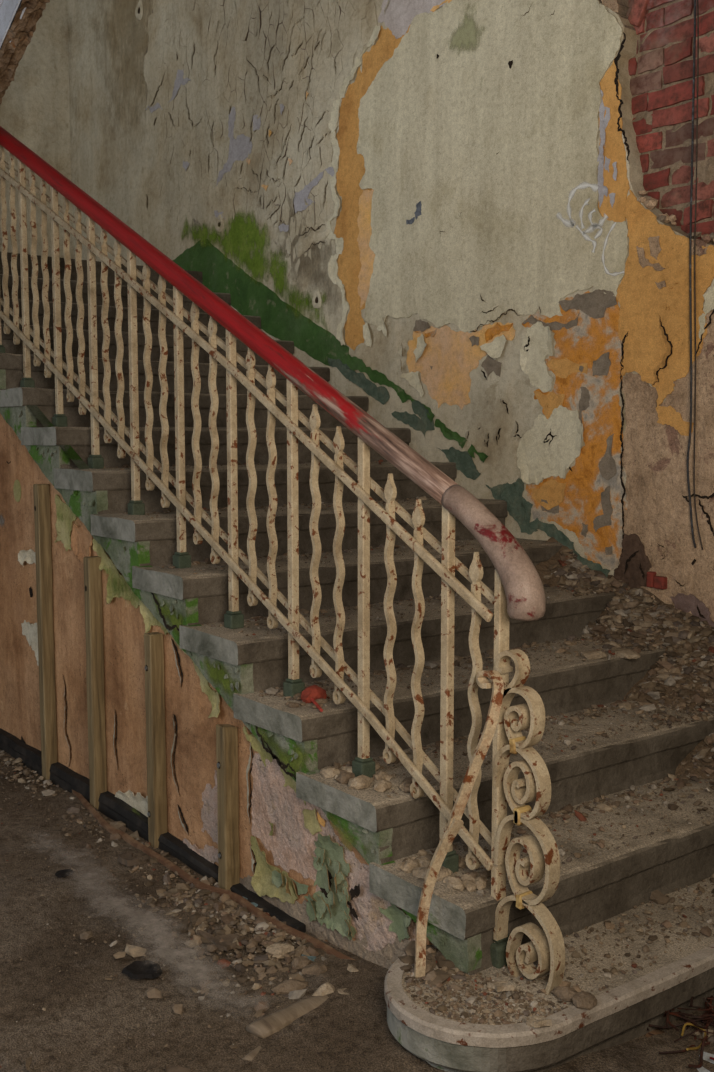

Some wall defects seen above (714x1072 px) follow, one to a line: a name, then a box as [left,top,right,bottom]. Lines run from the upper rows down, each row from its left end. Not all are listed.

spalling [0,0,50,105]
crack [144,0,340,236]
peeling [293,0,452,347]
spalling [599,0,714,244]
crack [151,592,192,655]
peeling [480,335,507,358]
crack [619,332,684,586]
flaking render [622,310,714,627]
crack [651,309,714,386]
crack [682,493,714,536]
crack [246,722,296,780]
flaking render [240,726,428,969]